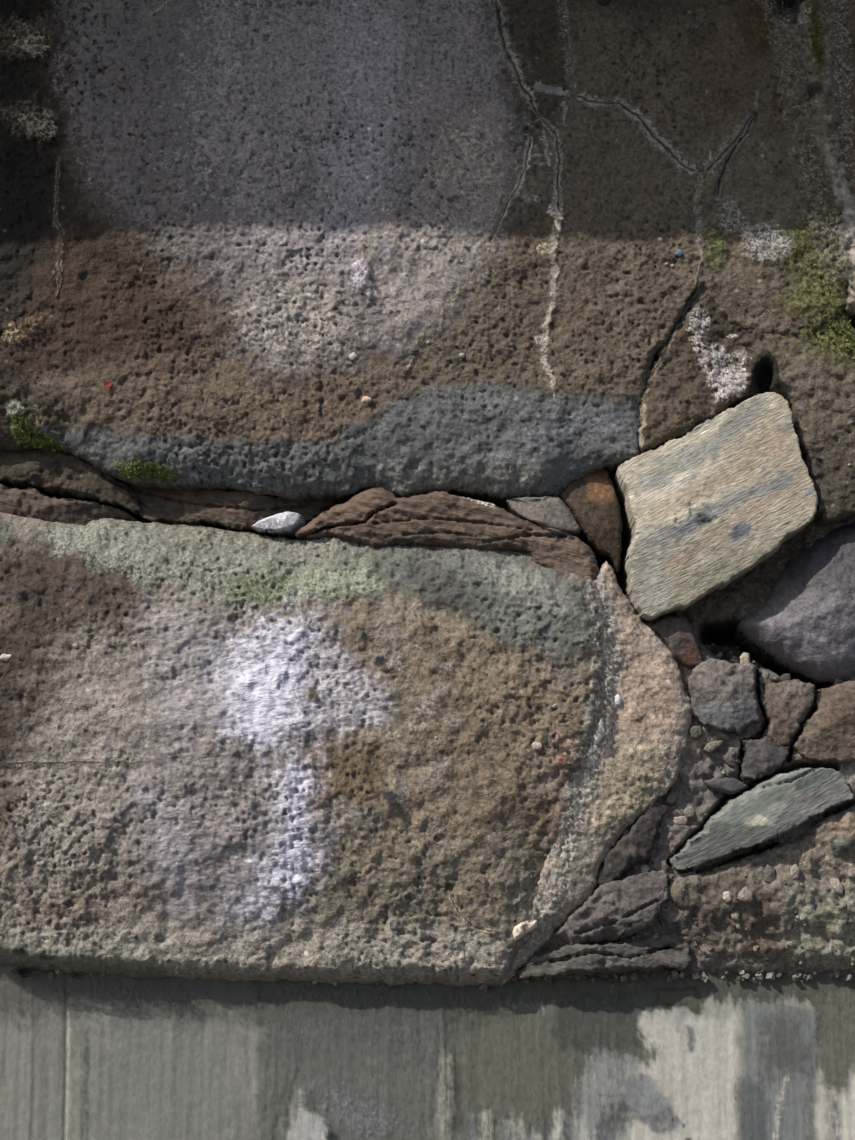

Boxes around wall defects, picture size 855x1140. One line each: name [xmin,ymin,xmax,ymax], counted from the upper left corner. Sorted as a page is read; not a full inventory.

crack [490,0,761,451]
efflorescence [712,197,793,262]
efflorescence [686,307,752,403]
damp [121,596,403,936]
damp [0,965,855,1140]